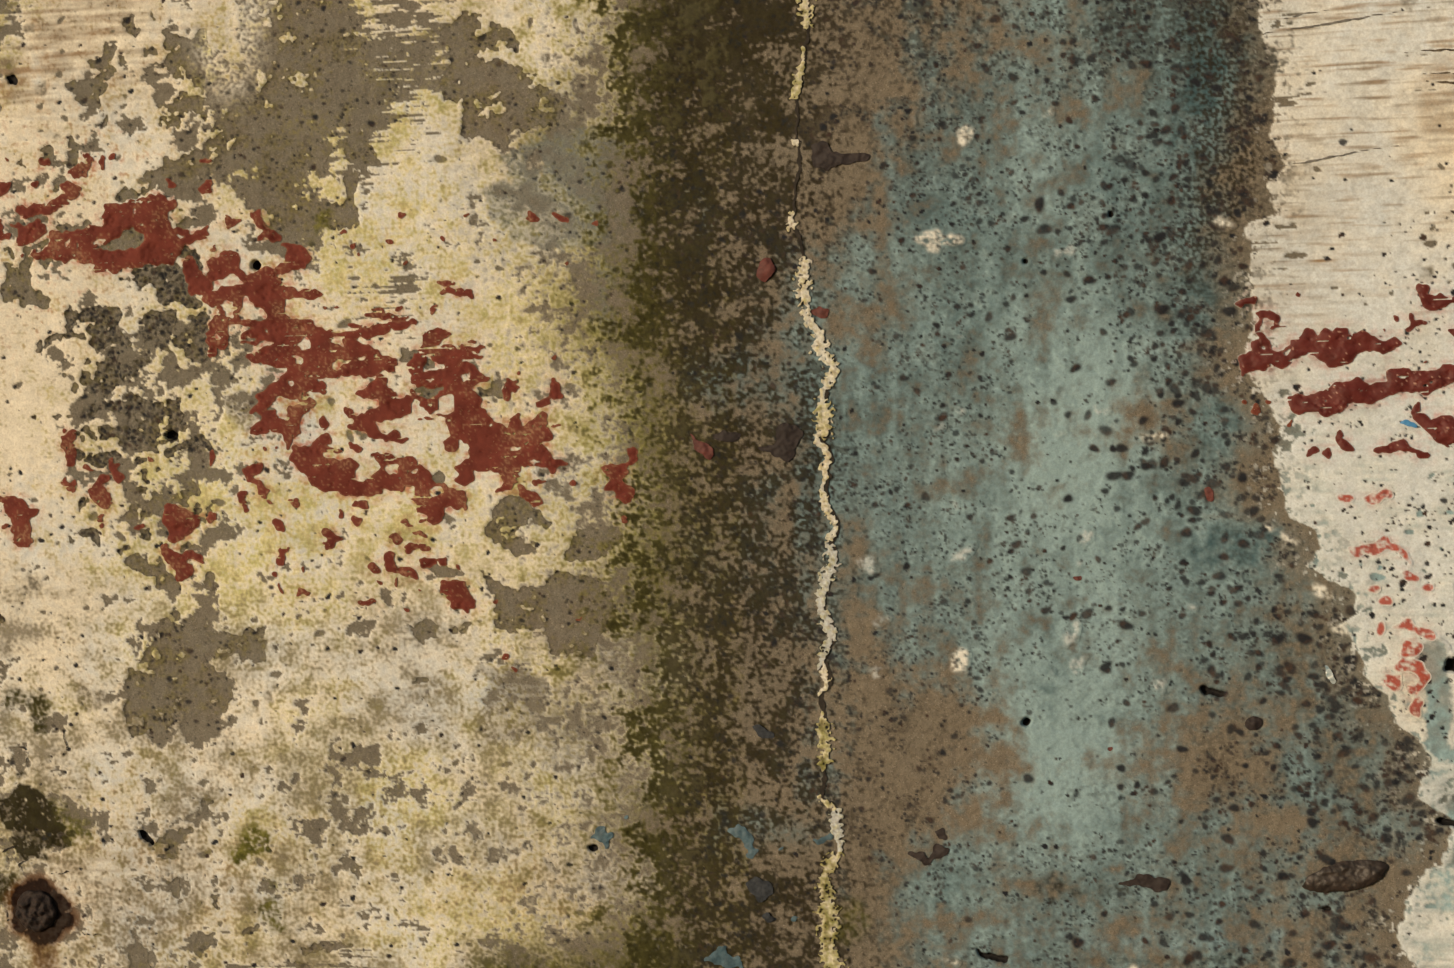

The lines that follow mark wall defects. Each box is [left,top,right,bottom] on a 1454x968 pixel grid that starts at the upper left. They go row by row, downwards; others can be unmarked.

corrosion [0,867,86,968]
peeling [0,0,638,748]
crack [786,0,849,968]
peeling [813,0,1454,936]